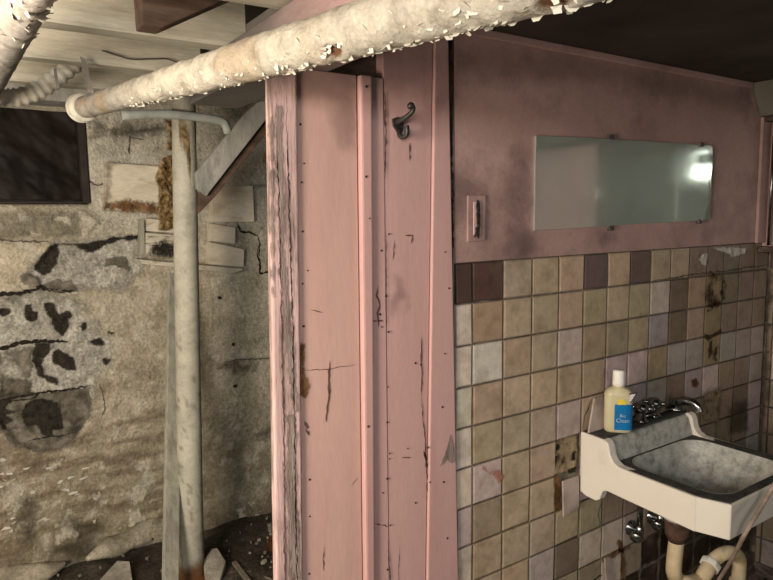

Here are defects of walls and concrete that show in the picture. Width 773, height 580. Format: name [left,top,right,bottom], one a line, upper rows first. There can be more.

peeling [0,0,58,40]
peeling [363,2,517,57]
peeling [517,0,612,22]
peeling [125,31,354,108]
peeling [699,247,746,266]
crack [0,285,77,297]
crack [0,339,68,350]
spalling [0,234,145,452]
crack [219,95,353,580]
spalling [588,396,604,433]
peeling [553,435,579,517]